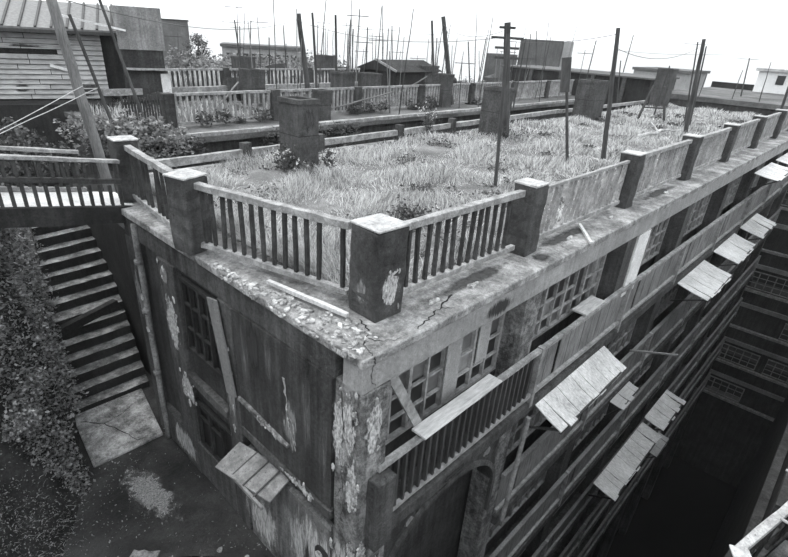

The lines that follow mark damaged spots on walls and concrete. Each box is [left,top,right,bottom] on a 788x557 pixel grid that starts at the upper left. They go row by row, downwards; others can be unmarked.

peeling [156,258,181,349]
peeling [382,269,401,309]
crack [418,294,452,328]
crack [359,319,398,389]
peeling [179,367,197,407]
peeling [331,387,382,513]
spalling [346,541,376,557]